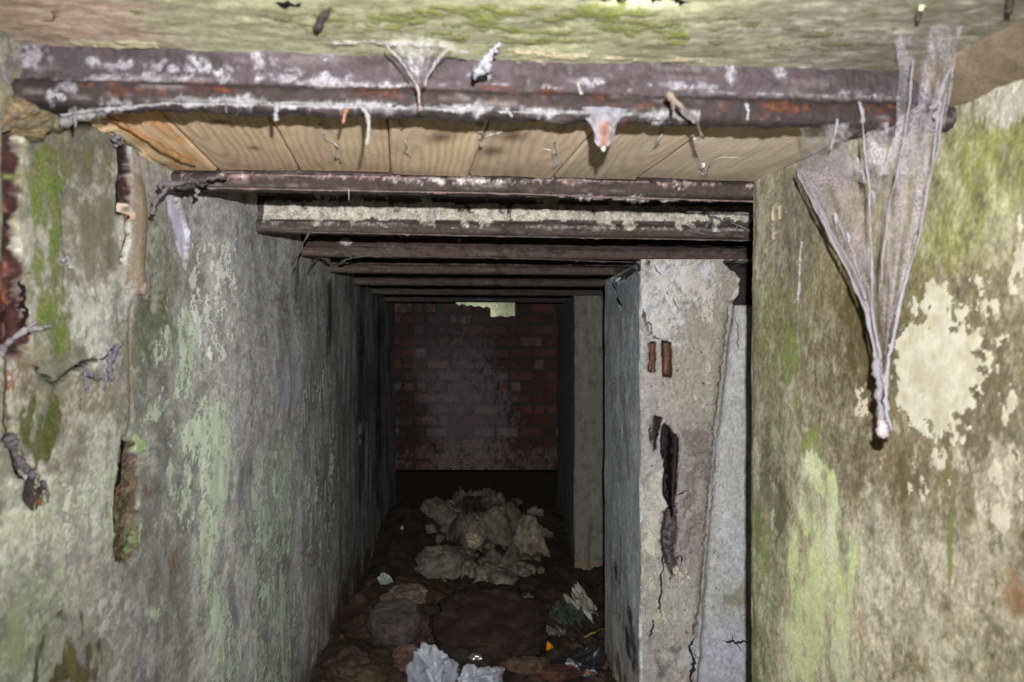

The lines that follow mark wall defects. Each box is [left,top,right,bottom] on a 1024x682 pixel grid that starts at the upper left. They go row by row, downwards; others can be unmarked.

leakage [0,31,52,84]
leakage [663,80,714,90]
rust [0,131,32,354]
spalling [115,145,137,225]
crack [33,300,132,437]
peeling [110,191,339,682]
spalling [643,430,712,625]
crack [648,306,739,682]
peeling [891,213,1024,505]